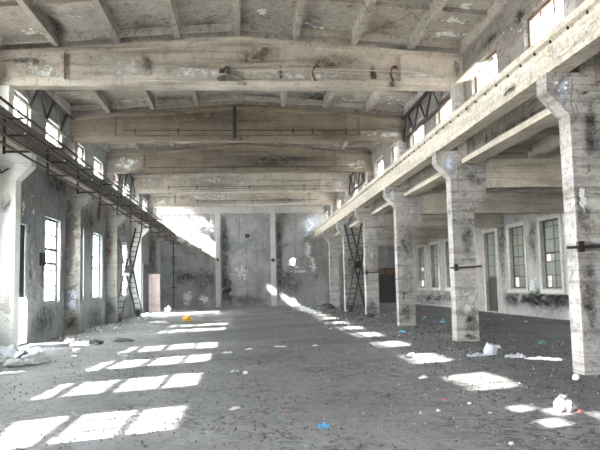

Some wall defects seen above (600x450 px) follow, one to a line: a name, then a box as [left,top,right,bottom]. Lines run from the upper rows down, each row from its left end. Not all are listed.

leakage [244,47,270,62]
leakage [586,116,598,154]
peeling [578,184,587,212]
leakage [222,220,254,303]
leakage [506,290,569,307]